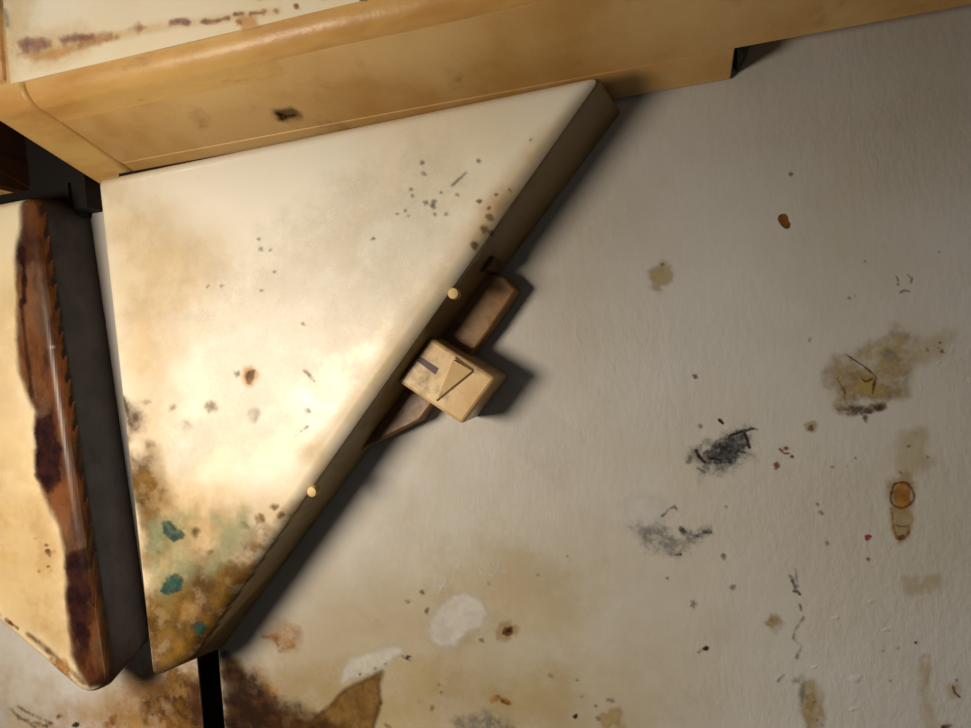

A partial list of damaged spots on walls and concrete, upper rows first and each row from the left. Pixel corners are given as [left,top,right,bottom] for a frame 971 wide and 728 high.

water stain [836,340,901,420]
rust [890,481,915,509]